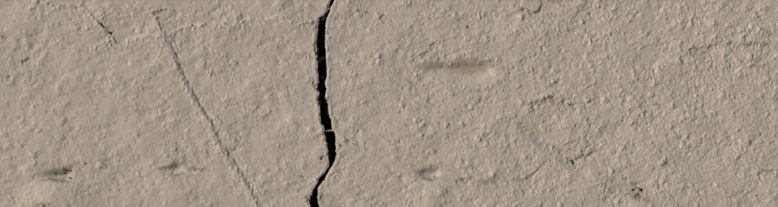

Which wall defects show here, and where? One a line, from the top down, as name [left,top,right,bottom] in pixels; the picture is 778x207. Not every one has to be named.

crack [34,0,341,207]